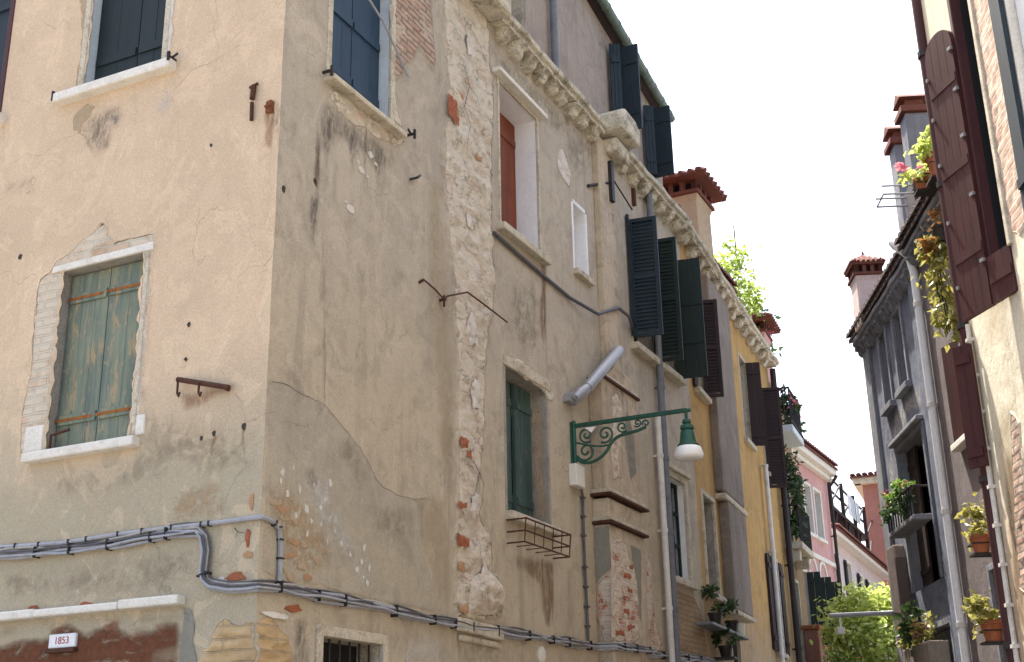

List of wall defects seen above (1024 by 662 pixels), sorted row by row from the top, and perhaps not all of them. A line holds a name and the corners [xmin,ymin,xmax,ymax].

flaking render [18,219,157,456]
flaking render [389,0,503,623]
spalling [197,604,302,662]
peeling [267,465,371,587]
crack [272,381,435,549]
flaking render [597,538,664,651]